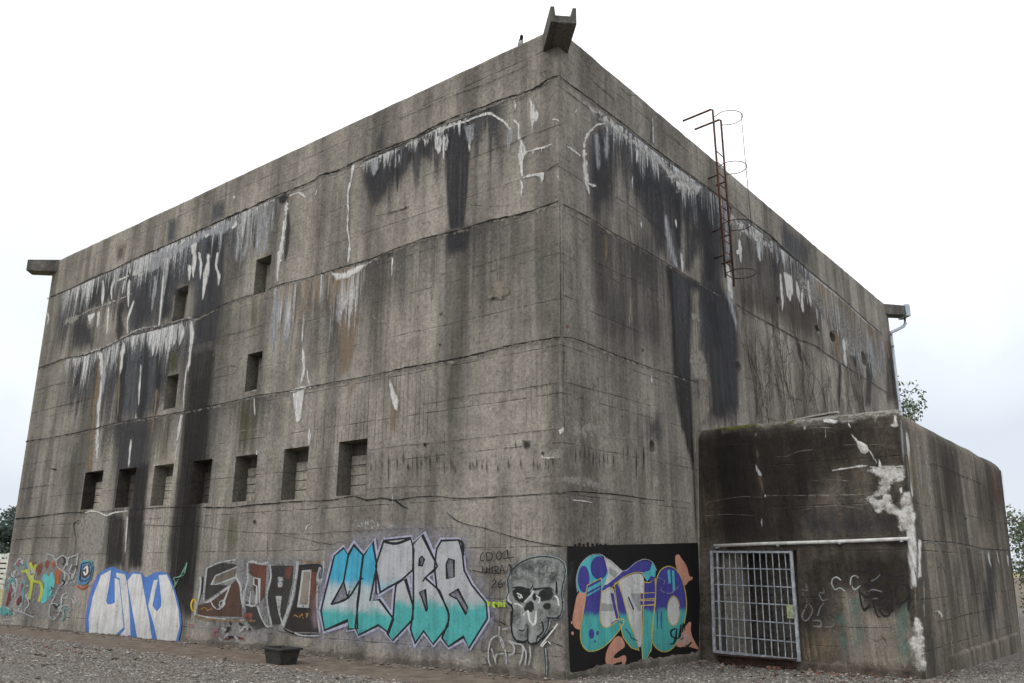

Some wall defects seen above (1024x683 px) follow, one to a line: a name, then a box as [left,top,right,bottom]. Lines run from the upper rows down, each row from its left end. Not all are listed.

leakage [47,99,551,616]
leakage [557,102,952,542]
crack [12,476,664,551]
leakage [805,550,909,628]
leakage [985,552,1016,629]